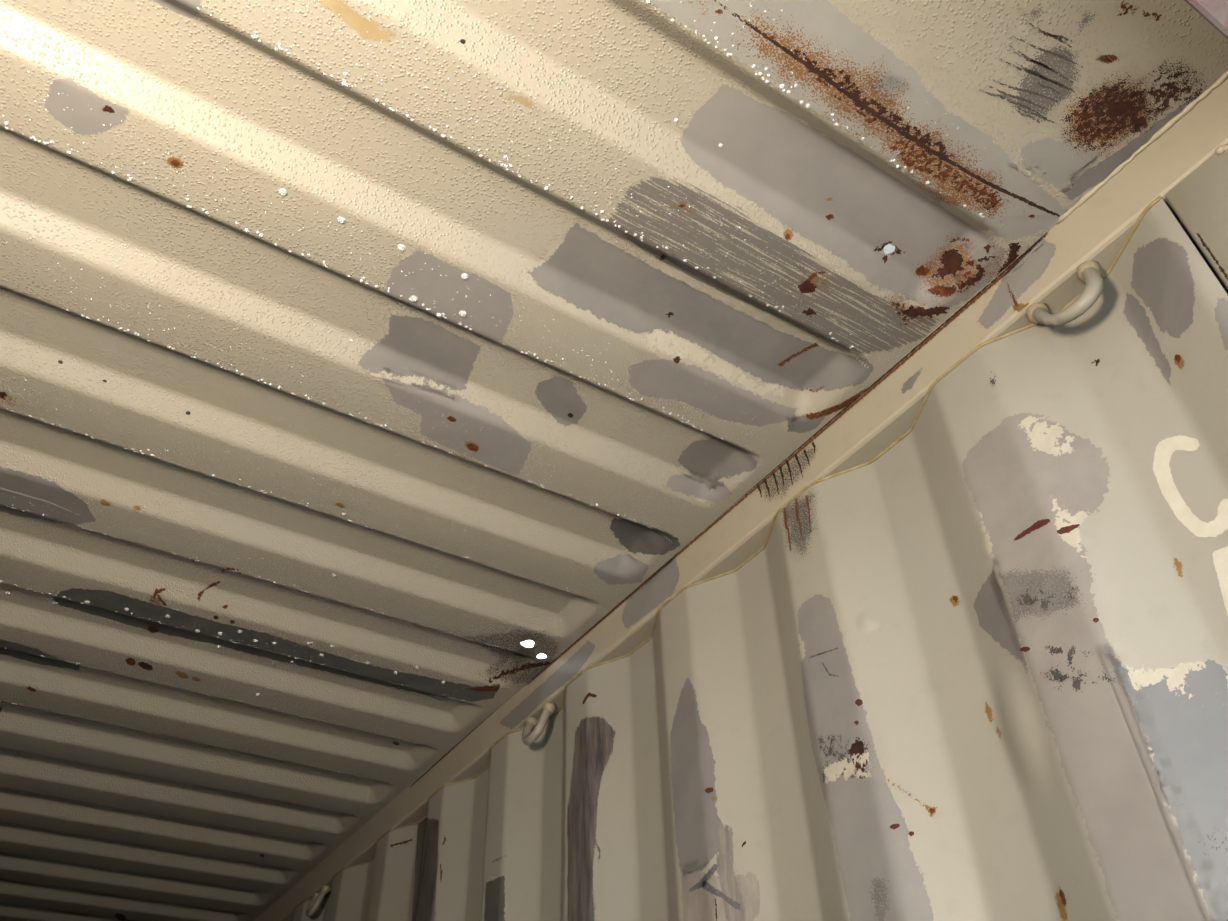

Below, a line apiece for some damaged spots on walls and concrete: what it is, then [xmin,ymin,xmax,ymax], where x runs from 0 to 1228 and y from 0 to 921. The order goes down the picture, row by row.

rust [1116,1,1162,21]
rust [1047,45,1207,170]
rust [410,0,1060,787]
spalling [1018,416,1075,456]
peeling [1124,661,1206,699]